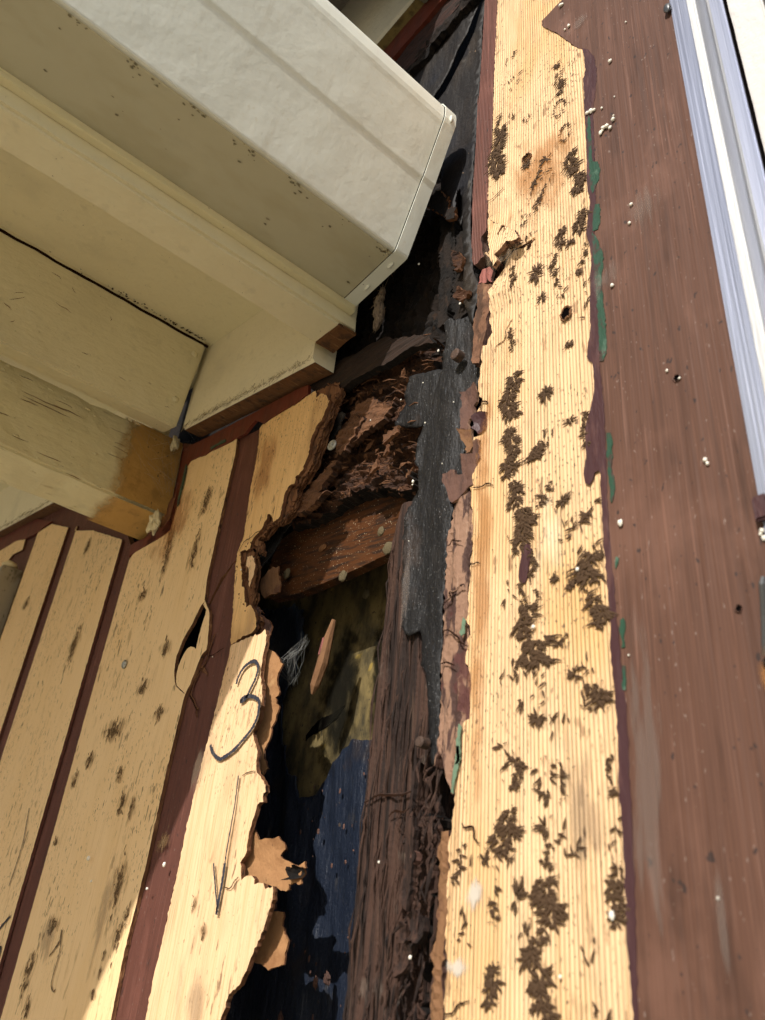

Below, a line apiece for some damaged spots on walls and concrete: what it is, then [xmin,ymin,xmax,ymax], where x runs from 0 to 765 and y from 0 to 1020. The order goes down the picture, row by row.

spalling [434,0,484,101]
peeling [478,245,506,285]
spalling [169,388,264,444]
spalling [234,350,434,611]
peeling [442,382,488,506]
spalling [178,607,206,666]
water stain [318,630,360,771]
water stain [369,615,383,730]